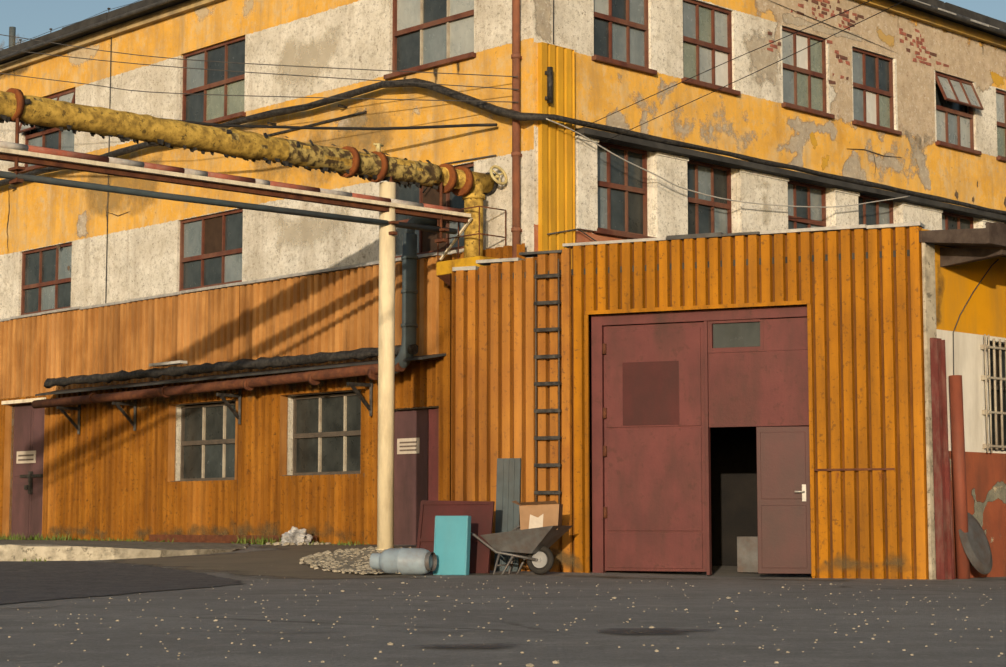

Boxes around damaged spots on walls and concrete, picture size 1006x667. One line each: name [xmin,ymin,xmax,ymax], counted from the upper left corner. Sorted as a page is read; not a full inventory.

peeling [606,78,677,134]
peeling [672,105,755,149]
flaking render [744,0,1006,190]
flaking render [971,481,1006,540]